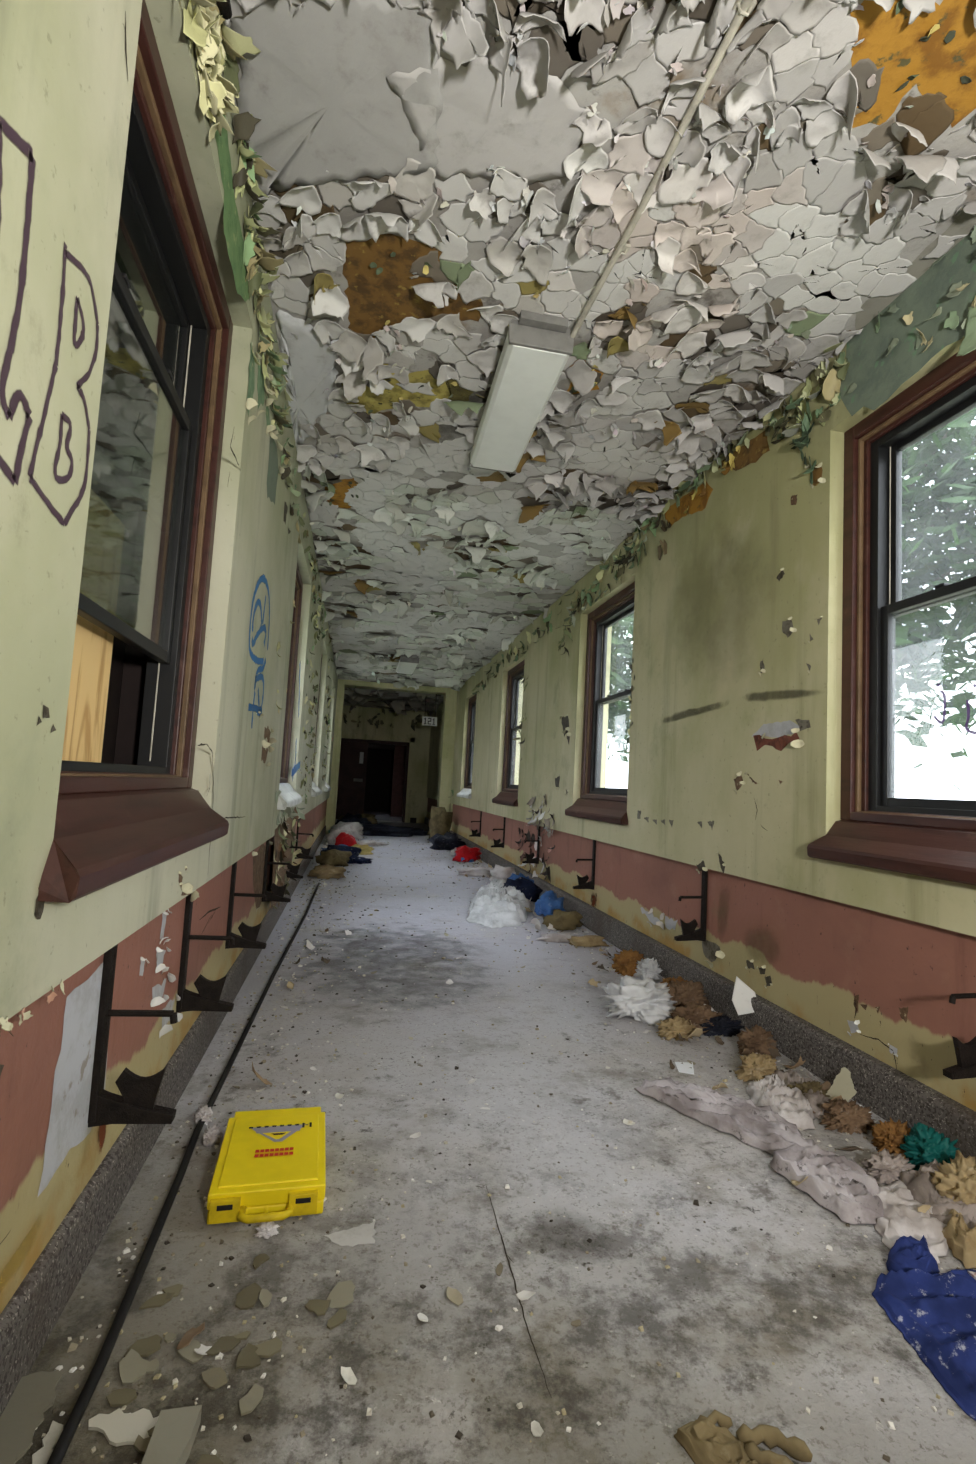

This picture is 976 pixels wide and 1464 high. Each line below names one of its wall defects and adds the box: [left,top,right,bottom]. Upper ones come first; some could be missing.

peeling [36,705,56,733]
peeling [34,882,45,920]
peeling [641,907,677,930]
peeling [702,940,725,968]
peeling [139,909,183,1038]
peeling [745,959,773,988]
peeling [46,979,65,1004]
peeling [0,1007,33,1037]
peeling [847,995,880,1036]